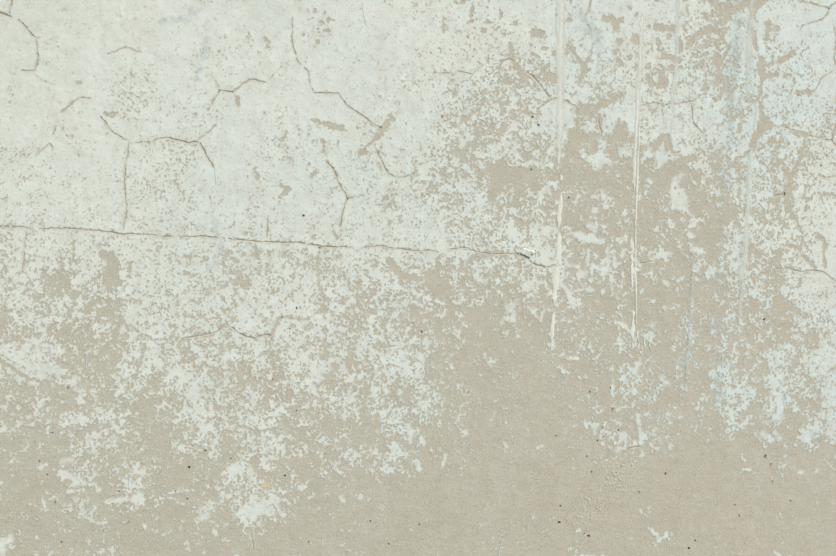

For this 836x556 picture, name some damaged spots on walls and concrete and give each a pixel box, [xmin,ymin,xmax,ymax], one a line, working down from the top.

crack [0,0,47,82]
peeling [641,0,768,102]
crack [797,0,836,93]
crack [643,94,707,142]
peeling [723,47,796,184]
crack [0,18,576,373]
water stain [614,15,651,350]
peeling [748,131,813,242]
crack [772,123,836,231]
water stain [550,194,563,350]
peeling [708,231,830,447]
spalling [565,449,644,531]